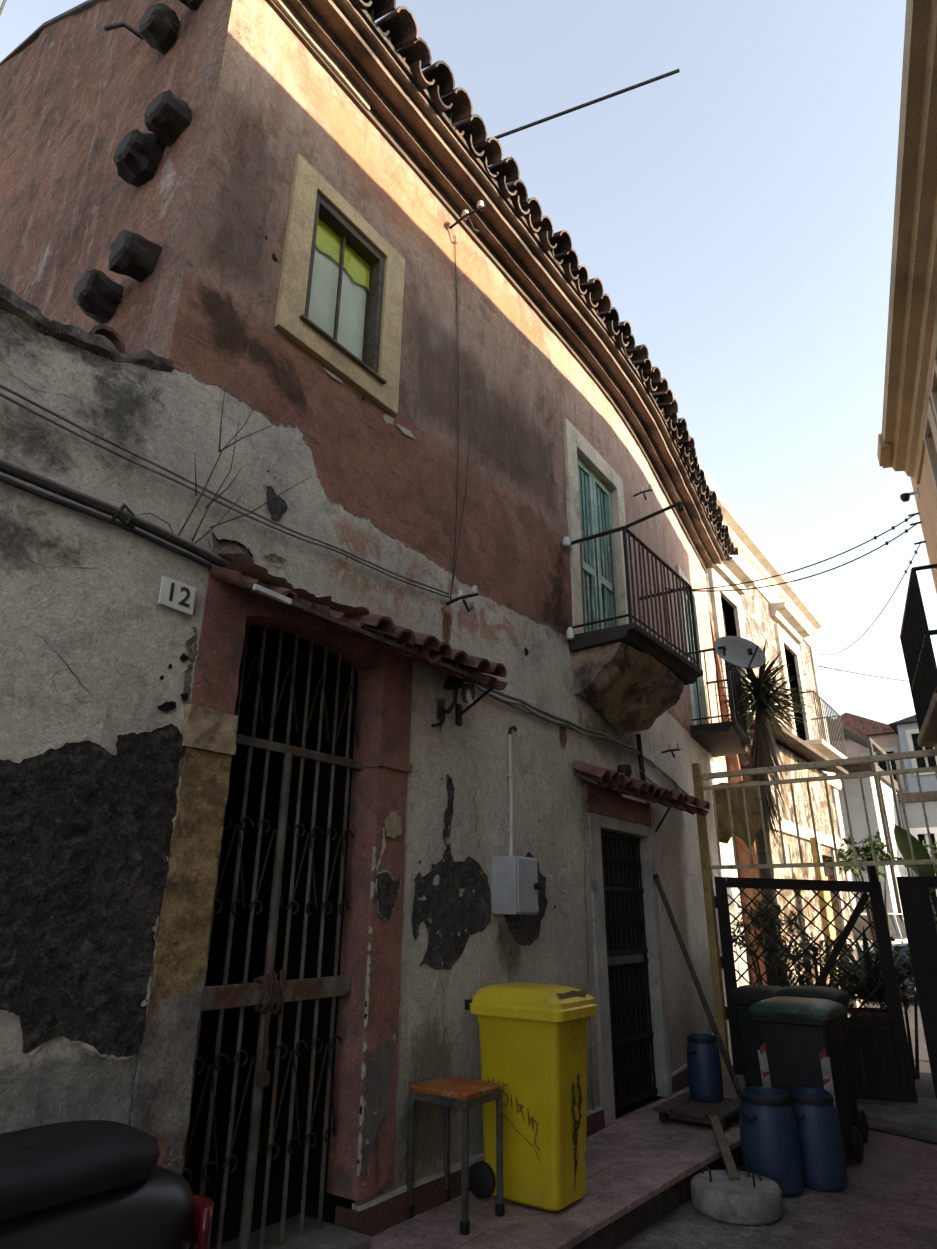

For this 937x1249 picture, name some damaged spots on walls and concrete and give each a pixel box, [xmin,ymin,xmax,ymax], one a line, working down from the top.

water stain [195,291,306,410]
spalling [382,414,416,439]
flaking render [265,470,289,523]
spalling [208,528,288,567]
flaking render [0,625,200,1060]
flaking render [364,773,556,1027]
spalling [154,1133,184,1174]